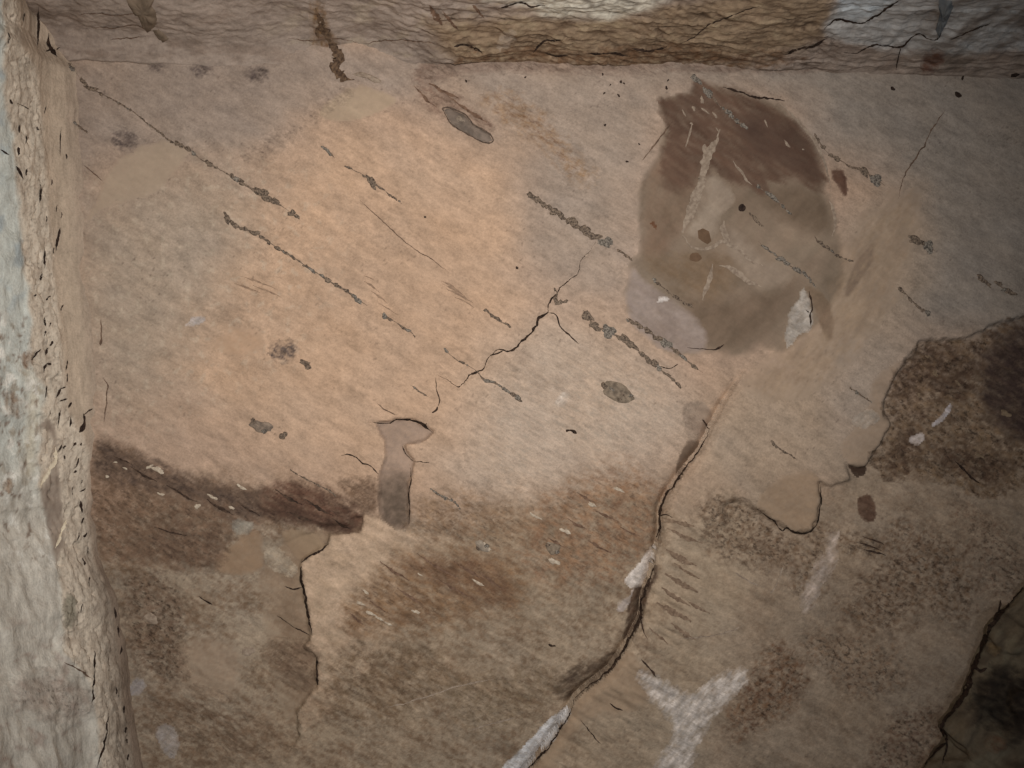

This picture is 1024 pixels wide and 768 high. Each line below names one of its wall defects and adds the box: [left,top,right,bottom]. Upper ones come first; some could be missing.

leakage [409,28,831,308]
crack [278,545,327,685]
spalling [376,417,434,472]
leakage [242,327,708,768]
crack [373,242,596,431]
crack [528,420,710,768]
peeling [757,468,822,534]
leakage [784,287,814,349]
leakage [633,485,1024,768]
spalling [857,493,877,524]
efflorescence [909,403,953,446]
crack [923,587,1023,768]